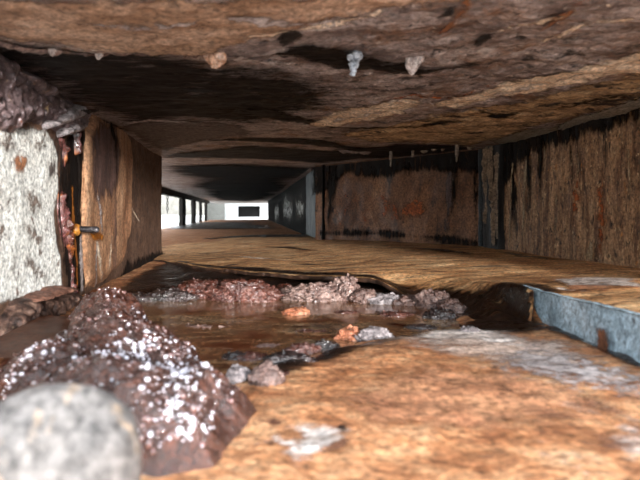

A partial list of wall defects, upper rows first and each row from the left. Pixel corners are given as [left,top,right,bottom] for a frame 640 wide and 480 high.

water stain [0,41,461,129]
water stain [92,121,121,227]
water stain [166,108,640,254]
corrosion [57,187,84,293]
water stain [121,251,640,394]
corrosion [596,328,608,353]